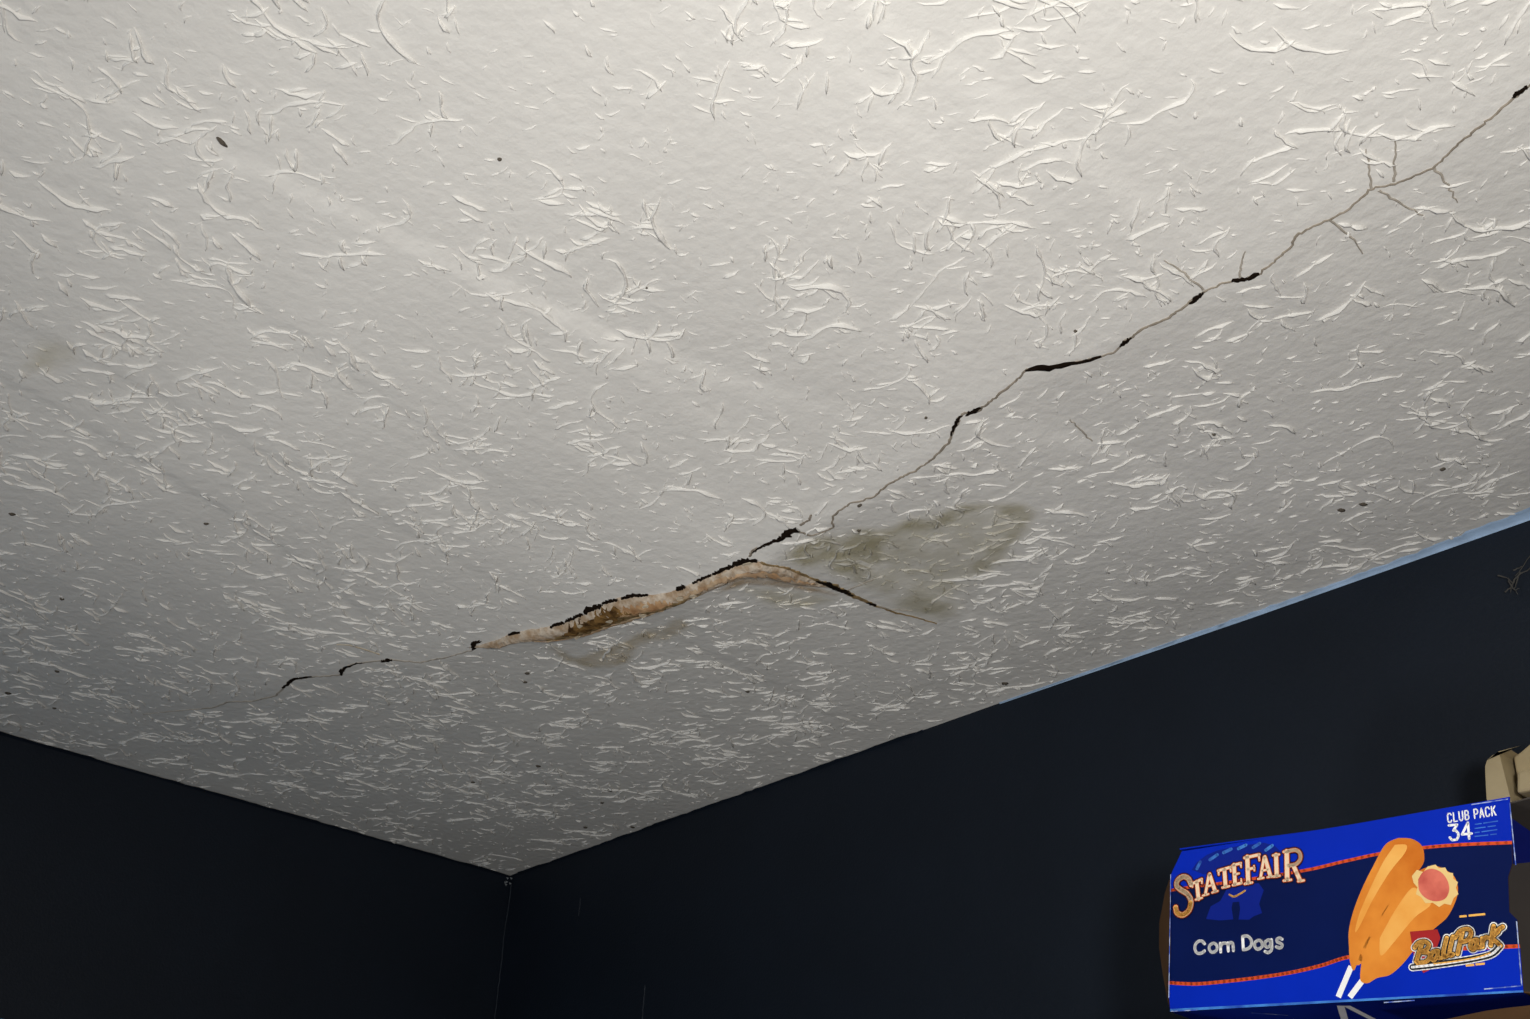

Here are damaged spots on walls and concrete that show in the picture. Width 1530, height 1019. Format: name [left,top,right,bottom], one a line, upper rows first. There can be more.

peeling [467,558,829,651]
crack [749,84,1530,624]